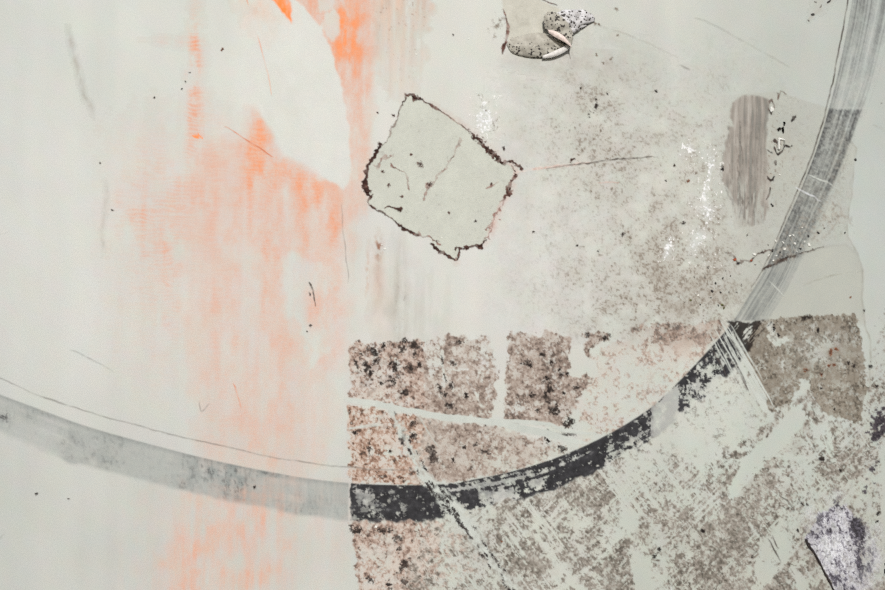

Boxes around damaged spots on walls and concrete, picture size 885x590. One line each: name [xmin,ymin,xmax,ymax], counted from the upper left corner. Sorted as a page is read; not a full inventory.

rust [370,0,438,104]
peeling [487,0,636,91]
peeling [361,92,524,267]
rust [364,226,387,342]